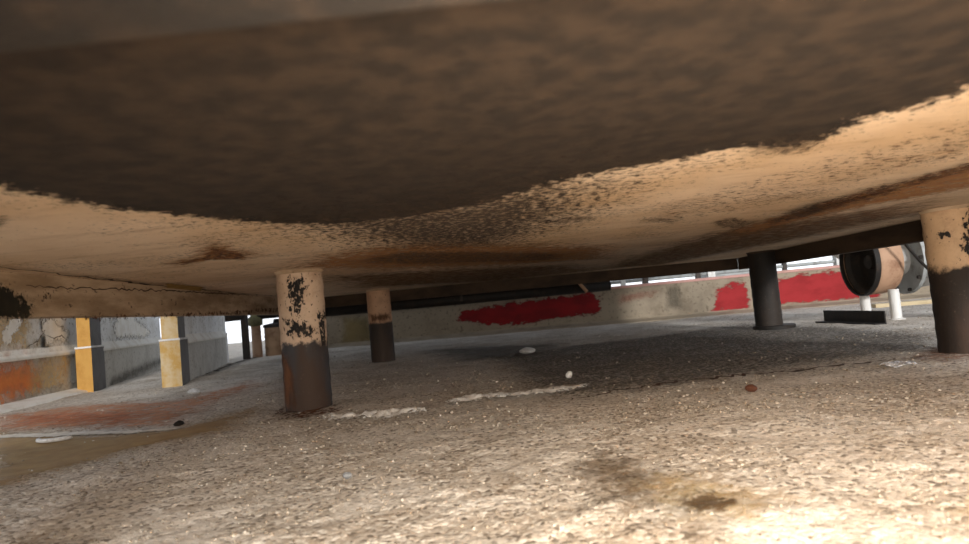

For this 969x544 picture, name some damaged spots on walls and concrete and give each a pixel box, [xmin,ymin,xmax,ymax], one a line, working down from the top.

leakage [0,0,969,254]
corrosion [171,244,249,265]
corrosion [295,242,613,270]
corrosion [735,163,969,234]
peeling [938,208,969,255]
peeling [282,273,326,346]
corrosion [267,354,342,420]